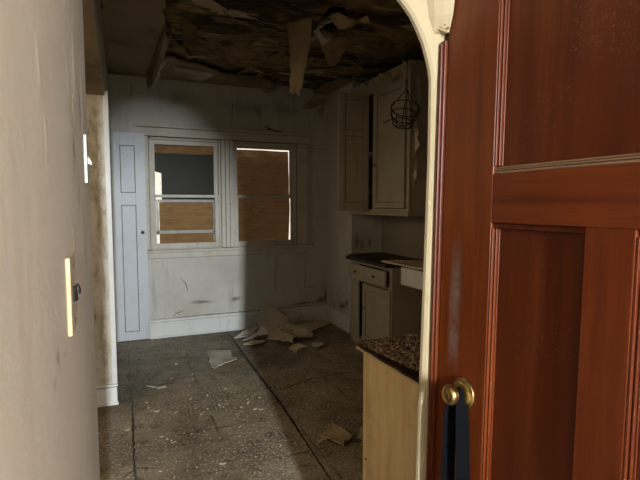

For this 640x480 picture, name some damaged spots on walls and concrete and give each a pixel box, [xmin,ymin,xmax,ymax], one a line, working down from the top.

peeling [191,0,260,33]
peeling [247,12,369,96]
crack [227,332,362,480]